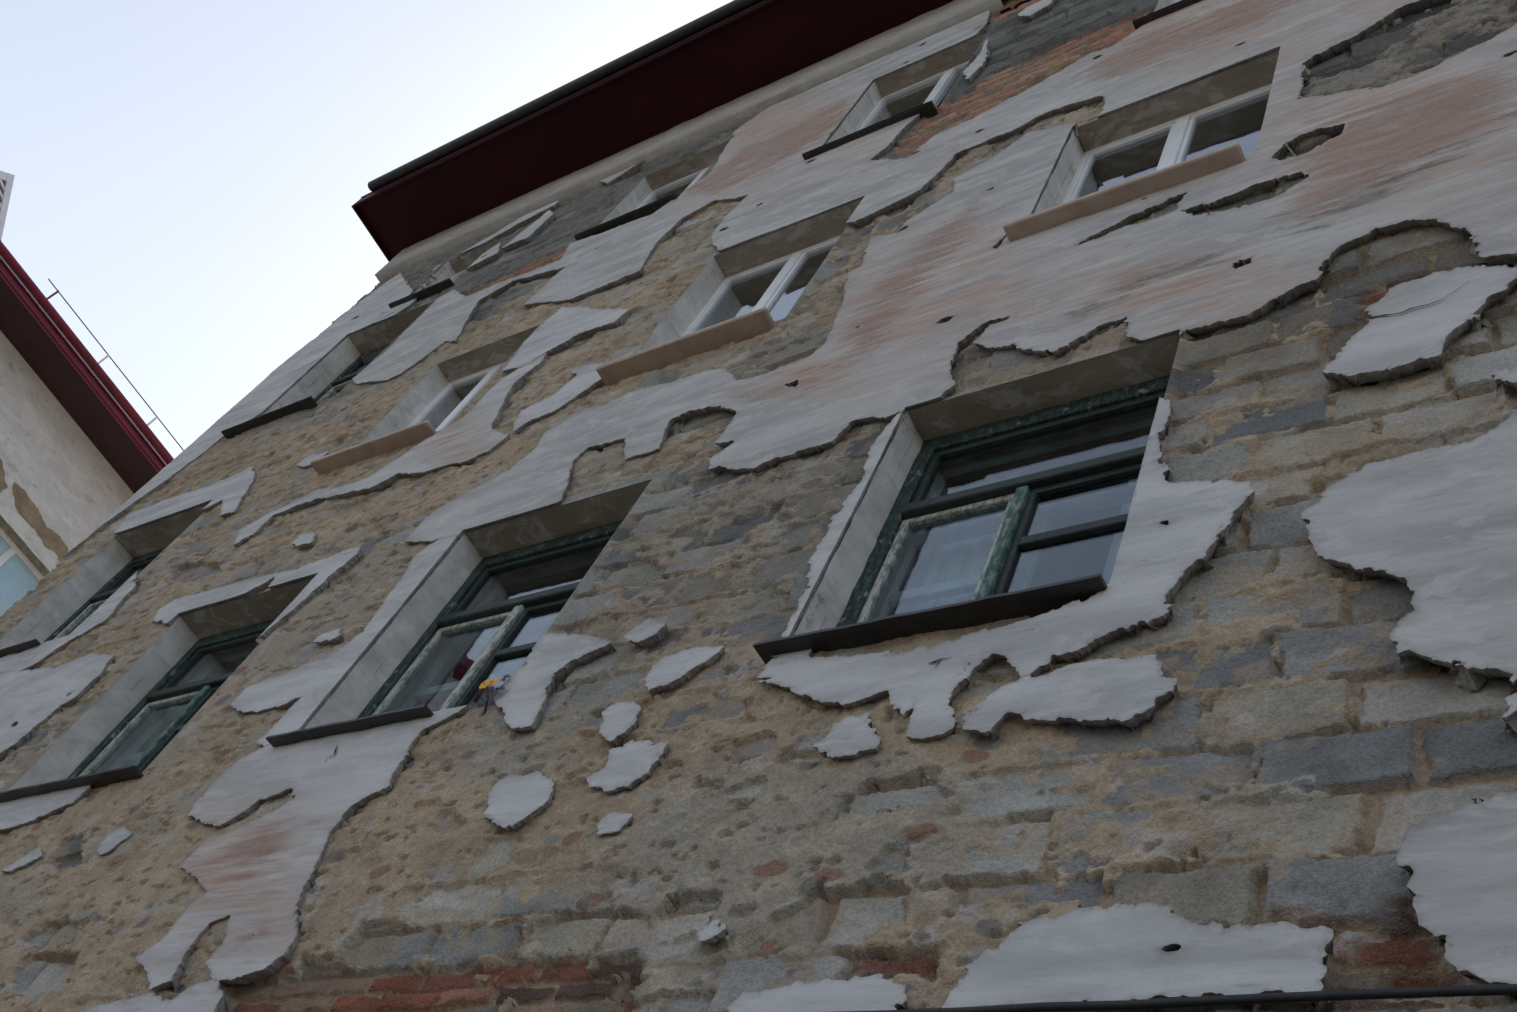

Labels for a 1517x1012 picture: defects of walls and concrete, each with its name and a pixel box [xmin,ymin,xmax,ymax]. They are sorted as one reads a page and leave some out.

spalling [879,0,1159,160]
spalling [1129,176,1305,225]
spalling [1278,133,1339,160]
spalling [1301,0,1517,98]
spalling [0,100,1105,1012]
spalling [287,226,1517,1012]